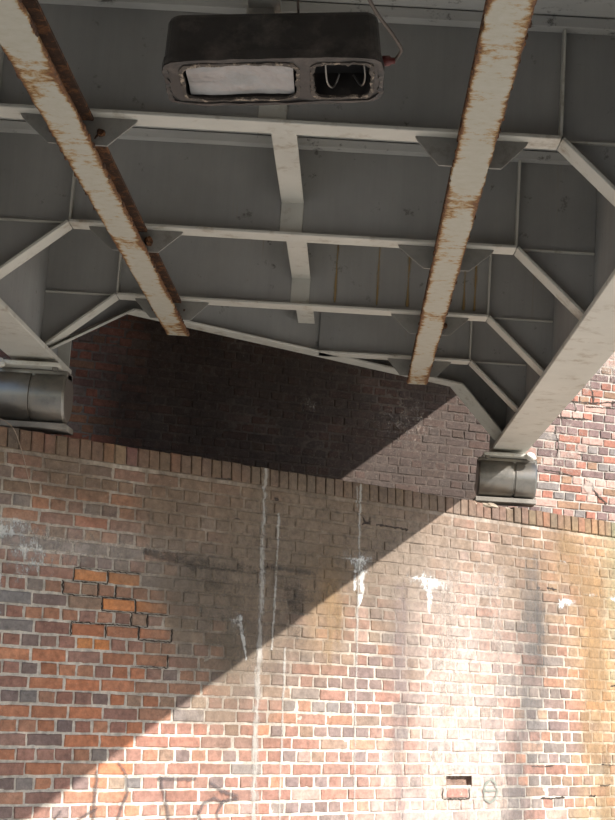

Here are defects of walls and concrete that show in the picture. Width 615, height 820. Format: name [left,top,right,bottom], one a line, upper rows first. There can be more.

crack [543,385,615,504]
water stain [0,518,124,577]
crack [61,567,173,669]
water stain [204,598,247,677]
water stain [250,469,277,820]
water stain [348,484,367,744]
water stain [414,572,456,616]
spalling [441,775,472,800]